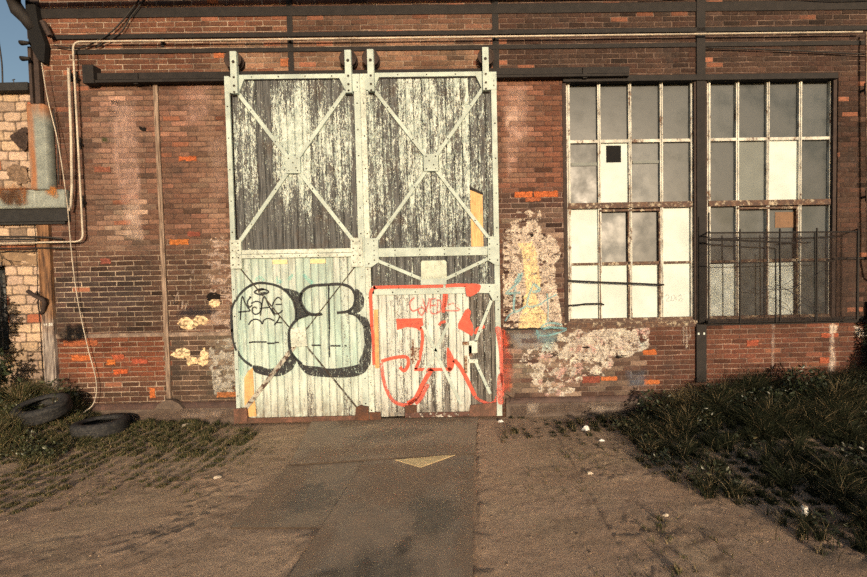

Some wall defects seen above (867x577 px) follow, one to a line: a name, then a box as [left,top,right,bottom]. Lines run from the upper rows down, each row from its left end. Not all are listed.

rust [0,186,26,204]
peeling [502,190,657,397]